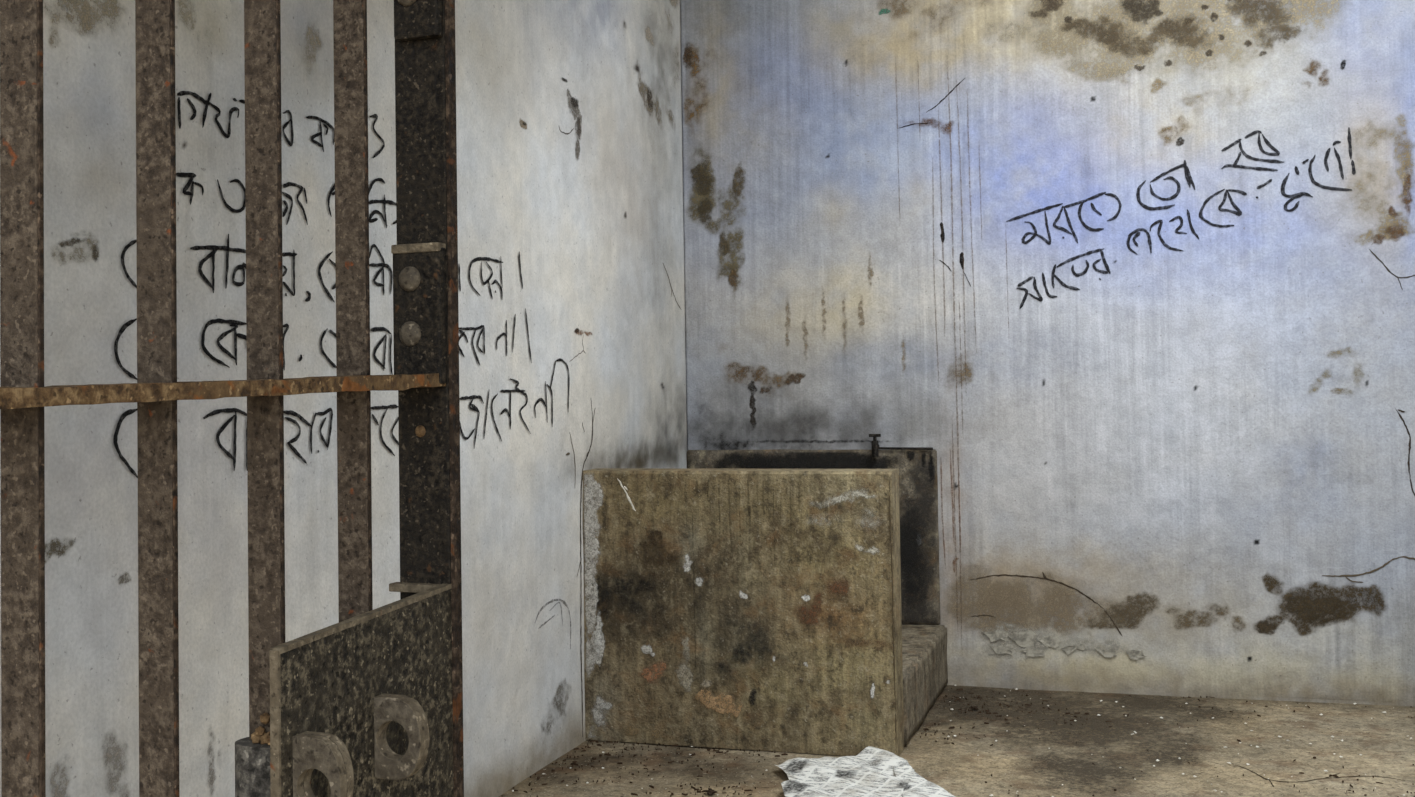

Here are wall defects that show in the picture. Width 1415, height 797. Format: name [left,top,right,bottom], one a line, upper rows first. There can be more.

water stain [881,0,944,25]
water stain [991,0,1339,92]
water stain [1349,115,1414,244]
water stain [705,60,1384,638]
water stain [593,530,680,619]